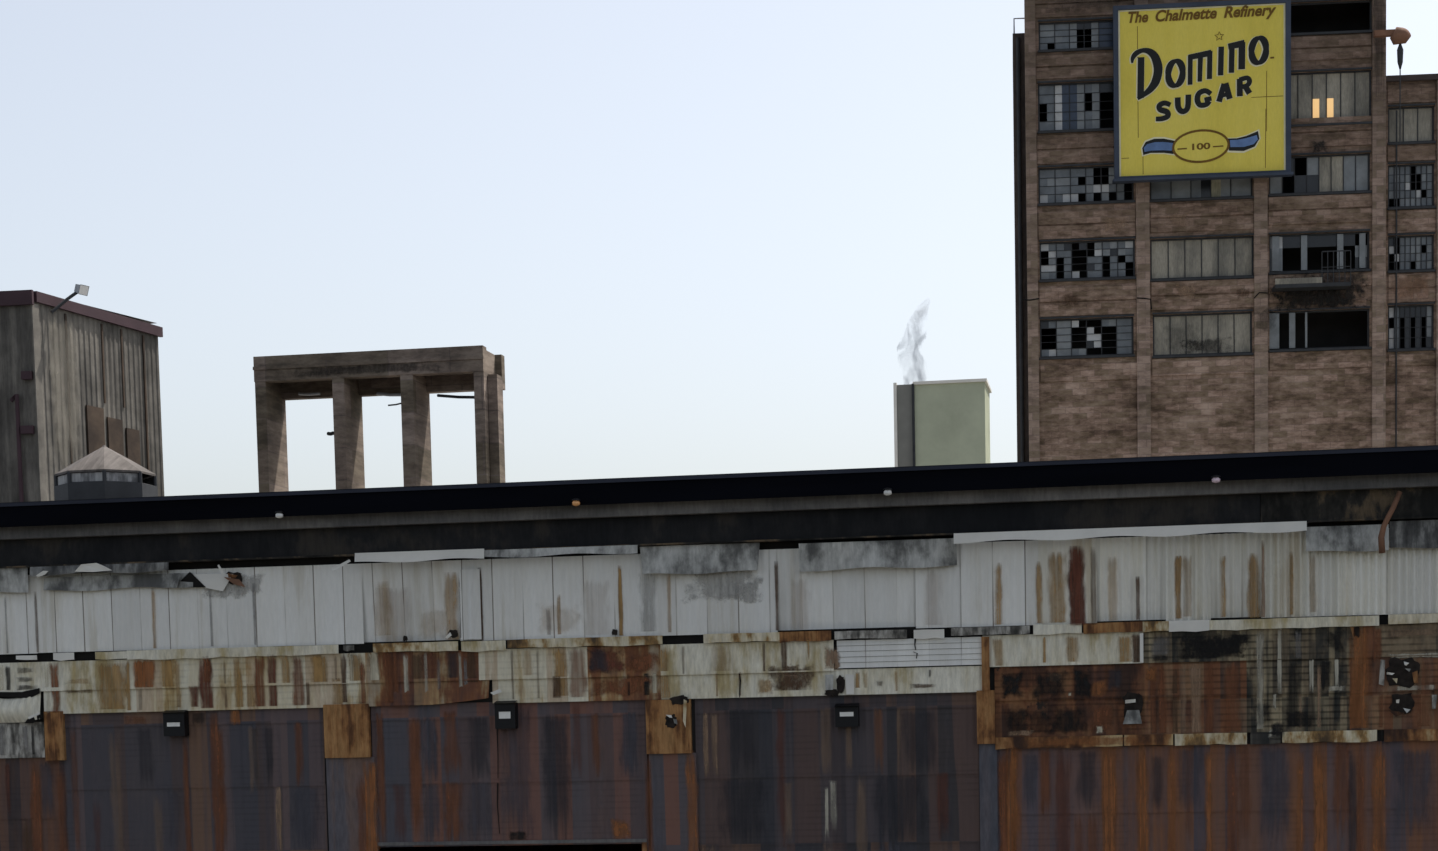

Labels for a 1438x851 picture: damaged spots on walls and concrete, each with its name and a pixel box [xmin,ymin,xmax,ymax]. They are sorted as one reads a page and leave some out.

corrosion [384,569,483,703]
water stain [693,570,761,602]
corrosion [1036,546,1096,663]
corrosion [1119,577,1140,662]
corrosion [1247,544,1265,618]
corrosion [50,664,59,712]
corrosion [100,586,366,851]
peeling [1379,653,1438,713]
corrosion [359,762,378,851]
corrosion [686,714,718,851]
corrosion [1297,745,1386,851]